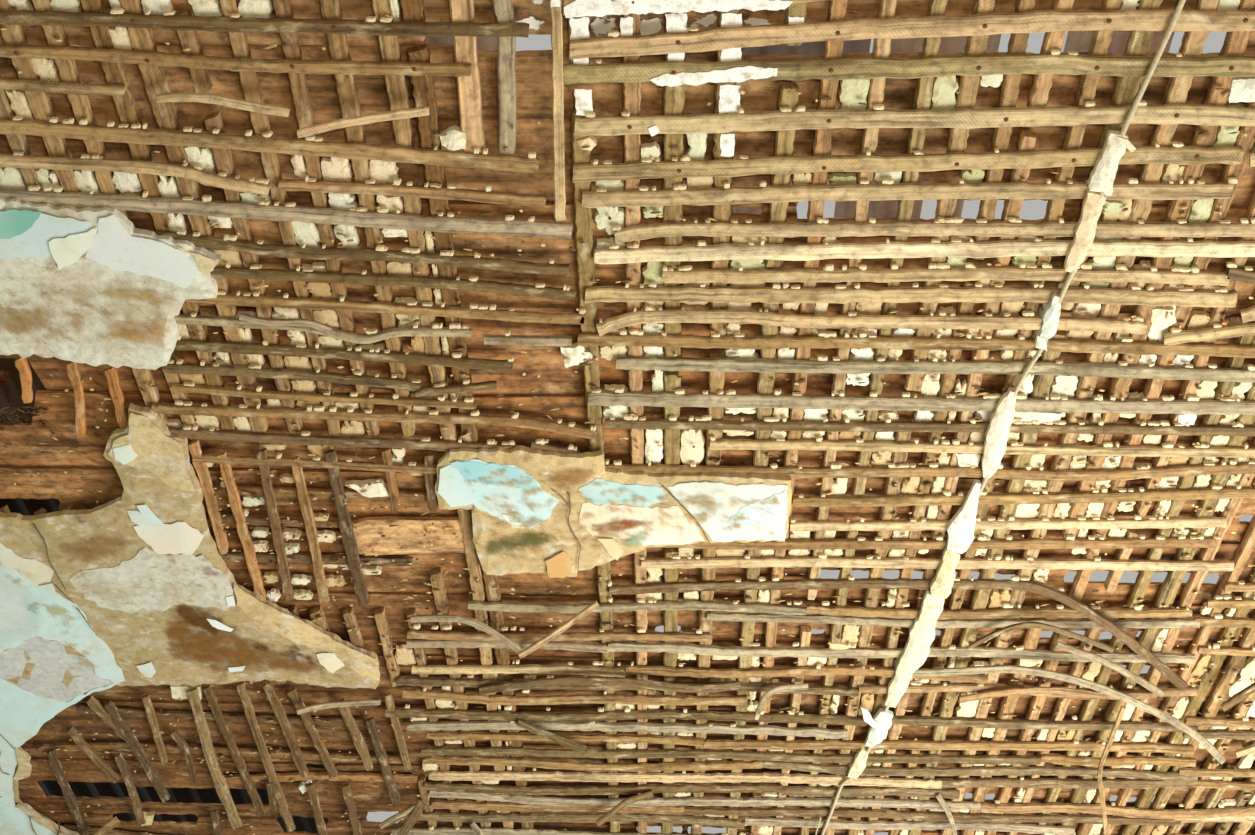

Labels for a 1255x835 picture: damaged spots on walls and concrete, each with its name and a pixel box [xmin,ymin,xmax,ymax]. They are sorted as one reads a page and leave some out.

peeling [1118,136,1136,152]
leakage [0,287,164,343]
leakage [166,607,324,672]
peeling [861,707,883,730]